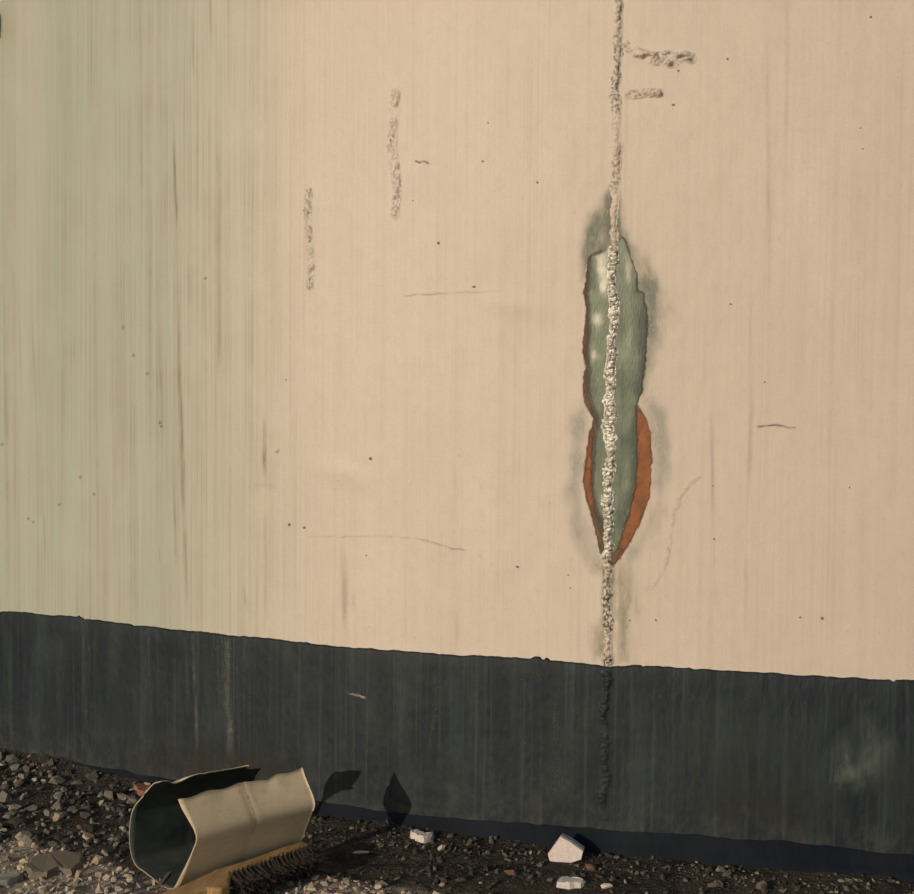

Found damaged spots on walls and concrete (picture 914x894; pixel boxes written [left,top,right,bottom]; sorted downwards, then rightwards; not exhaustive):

damp [584,194,620,266]
damp [640,277,657,336]
peeling [582,236,652,565]